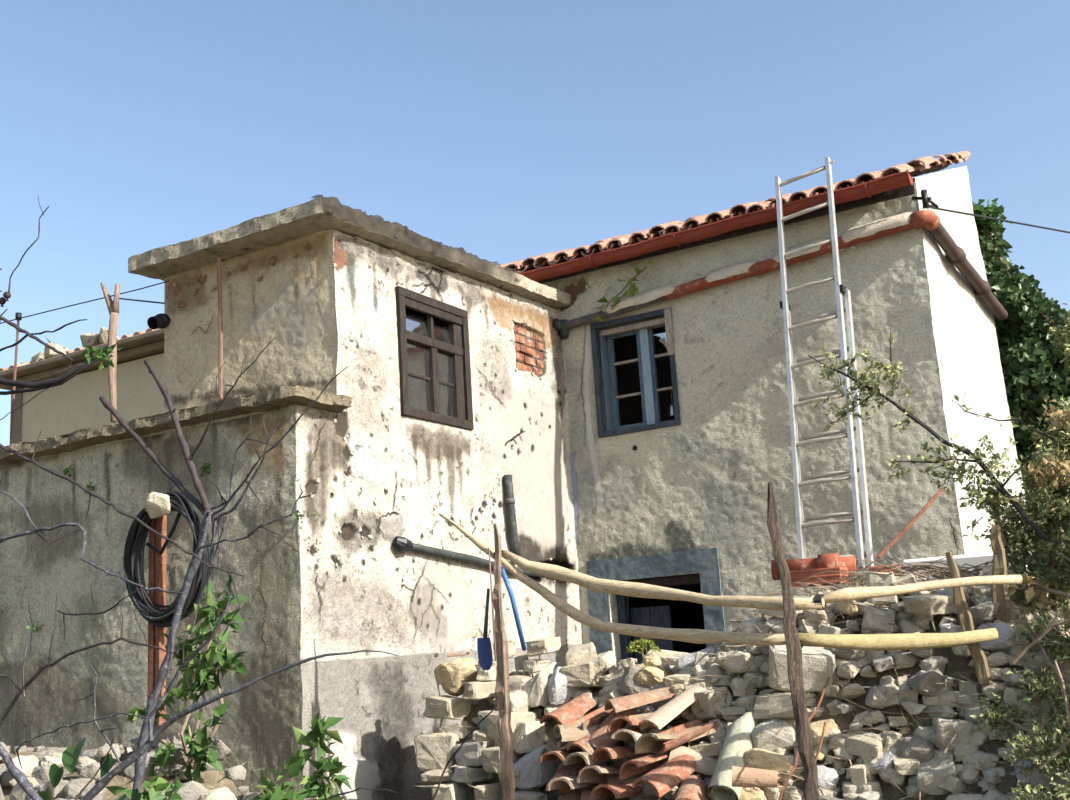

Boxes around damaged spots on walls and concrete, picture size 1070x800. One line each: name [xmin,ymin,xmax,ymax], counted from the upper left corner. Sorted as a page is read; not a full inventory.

flaking render [513,318,550,380]
water stain [411,425,470,525]
spalling [308,546,346,581]
spalling [339,508,374,565]
water stain [238,453,294,772]